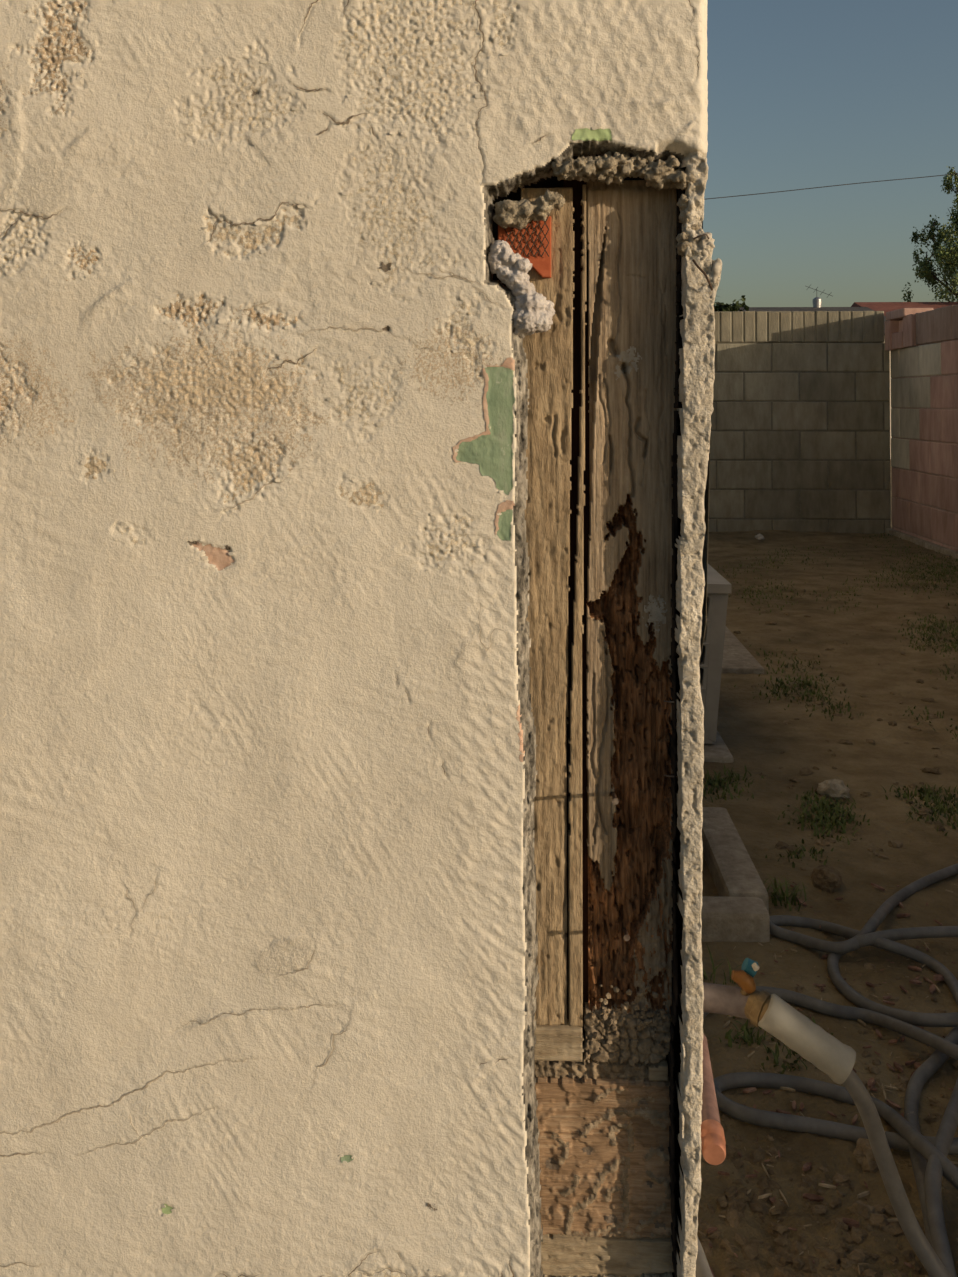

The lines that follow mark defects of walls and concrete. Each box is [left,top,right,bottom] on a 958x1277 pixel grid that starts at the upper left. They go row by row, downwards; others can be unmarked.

crack [298,0,349,44]
crack [295,86,377,137]
crack [474,0,487,182]
spalling [336,479,388,510]
peeling [188,539,234,571]
spalling [420,509,488,574]
spalling [446,127,684,1277]
crack [176,1004,350,1078]
crack [0,1058,254,1157]
crack [328,1252,441,1277]